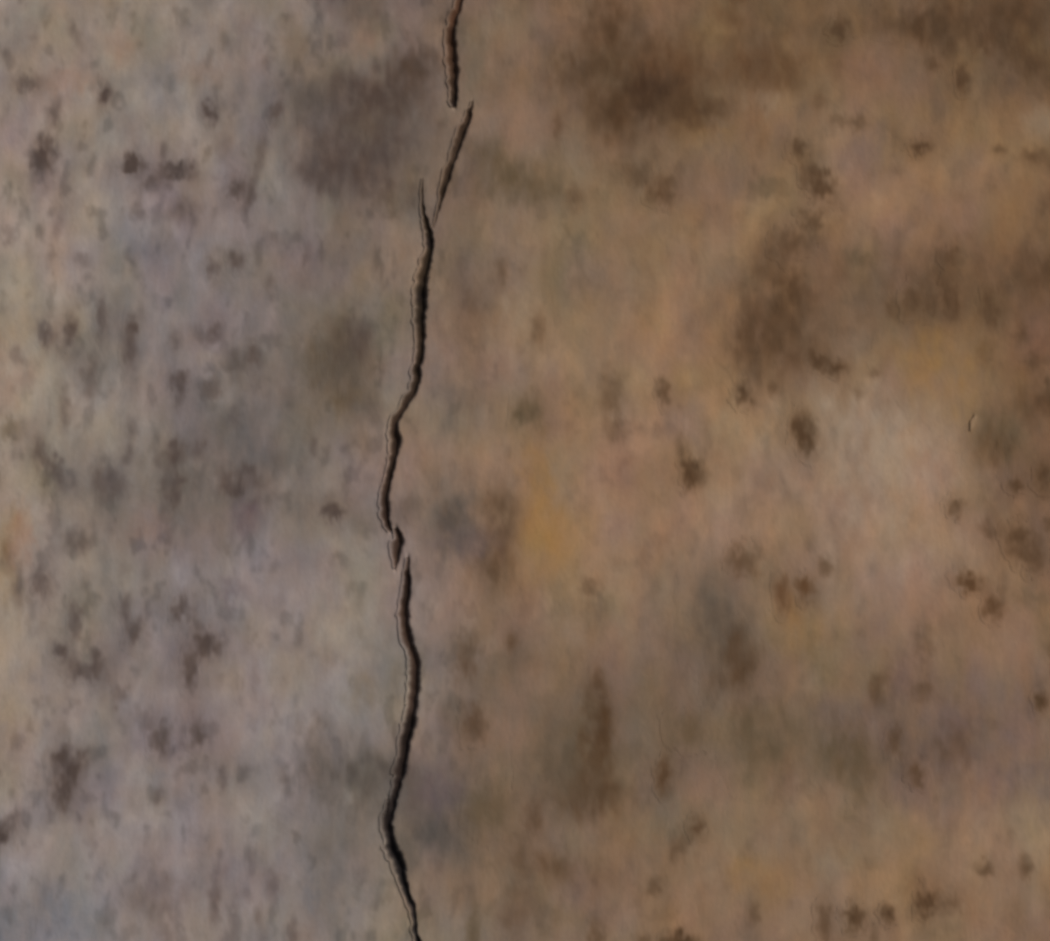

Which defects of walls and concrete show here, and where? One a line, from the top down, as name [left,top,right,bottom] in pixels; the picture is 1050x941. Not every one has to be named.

crack [378,0,474,941]